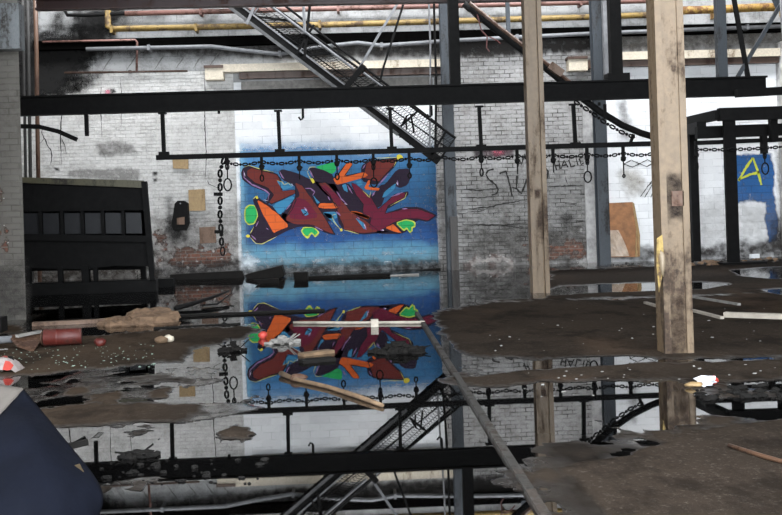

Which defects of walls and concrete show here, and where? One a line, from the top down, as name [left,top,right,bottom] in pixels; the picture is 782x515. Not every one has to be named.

flaking render [152,226,234,267]
flaking render [549,238,586,260]